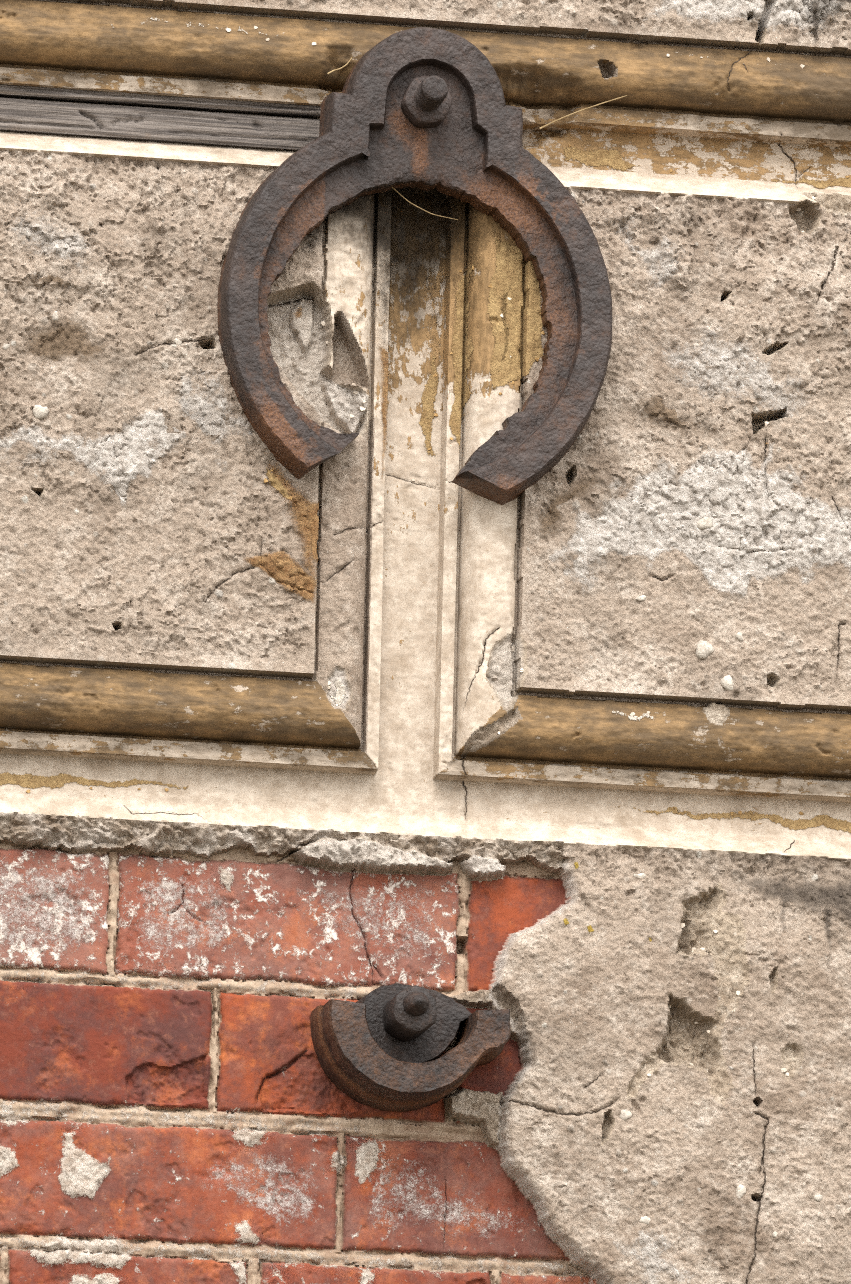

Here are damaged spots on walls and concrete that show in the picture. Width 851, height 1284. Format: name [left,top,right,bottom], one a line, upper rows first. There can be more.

rust [381,349,389,453]
spalling [0,812,565,876]
crack [349,868,381,983]
spalling [625,882,751,1106]
spalling [125,1055,208,1107]
crack [257,1050,307,1102]
spalling [259,1055,367,1116]
crack [500,1075,617,1116]
crack [746,1049,769,1284]